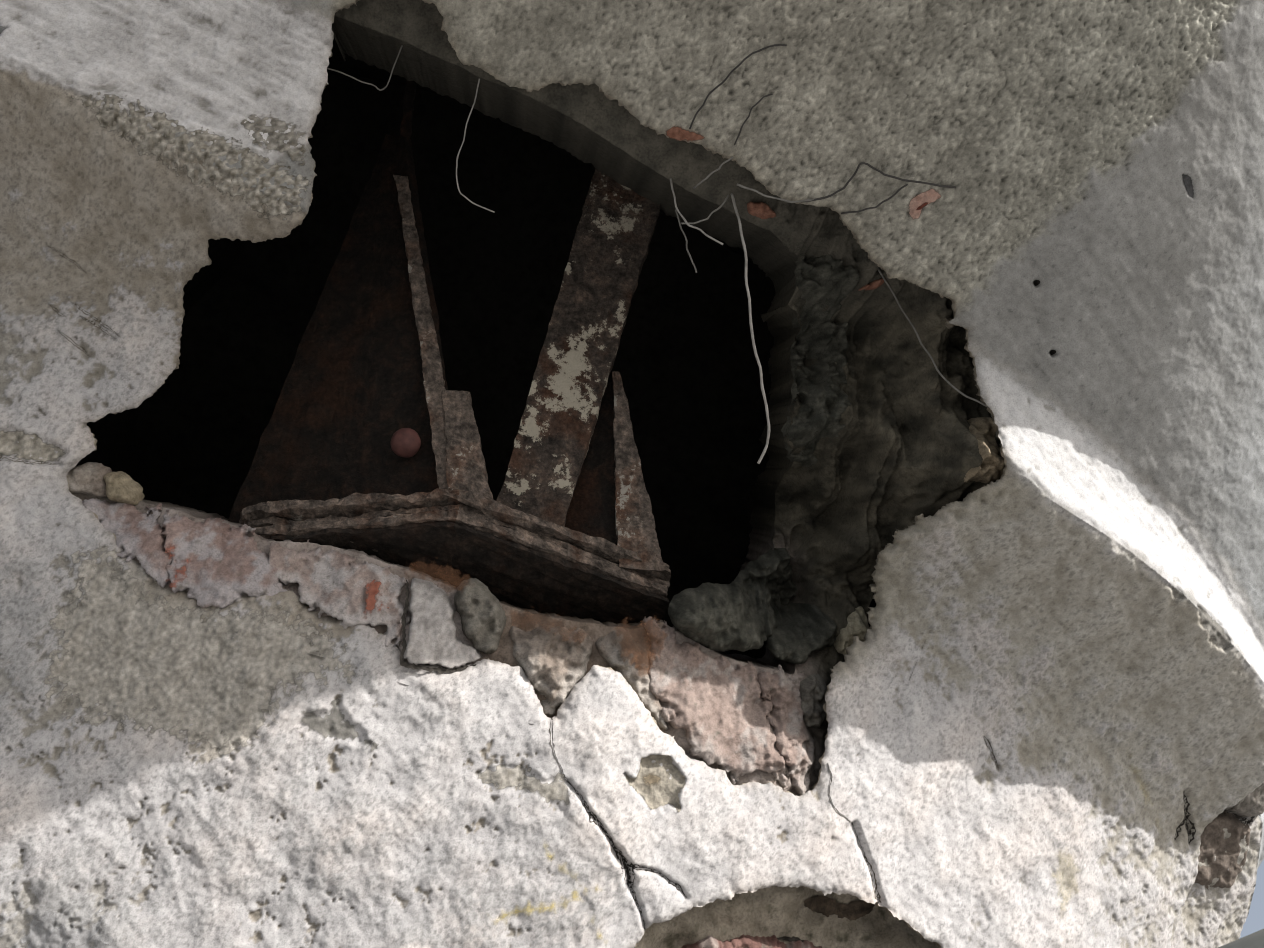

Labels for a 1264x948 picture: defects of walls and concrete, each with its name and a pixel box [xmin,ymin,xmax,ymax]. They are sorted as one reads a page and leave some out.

peeling [0,430,65,462]
spalling [44,0,1007,812]
rust [239,488,671,598]
rust [364,580,389,618]
crack [400,580,480,674]
crack [549,718,686,929]
spalling [1195,782,1264,889]
peeling [635,886,941,948]